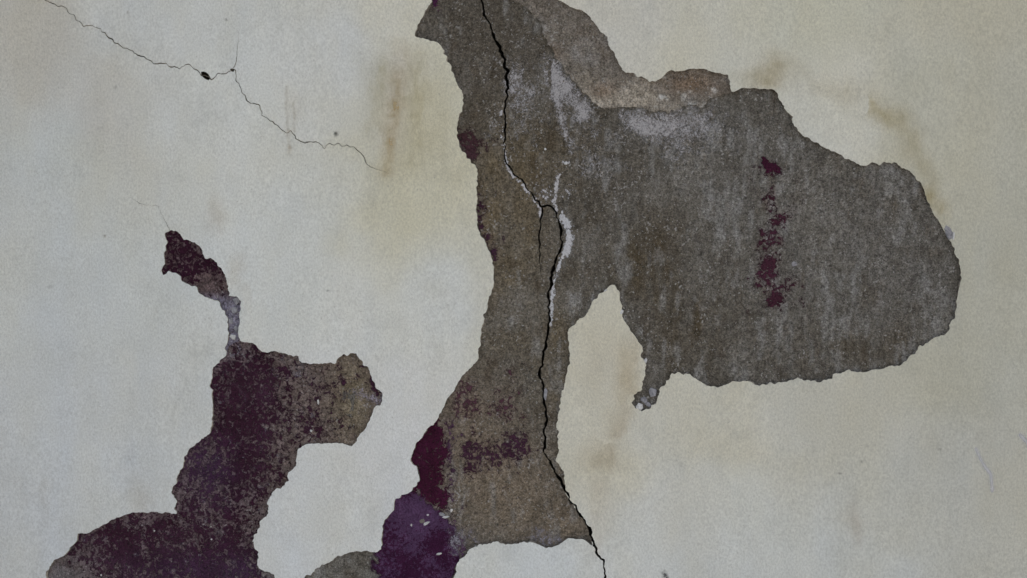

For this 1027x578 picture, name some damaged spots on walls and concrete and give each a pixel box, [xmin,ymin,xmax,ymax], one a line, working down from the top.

peeling [48,231,383,578]
crack [48,1,387,173]
crack [481,0,607,578]
peeling [410,0,961,578]